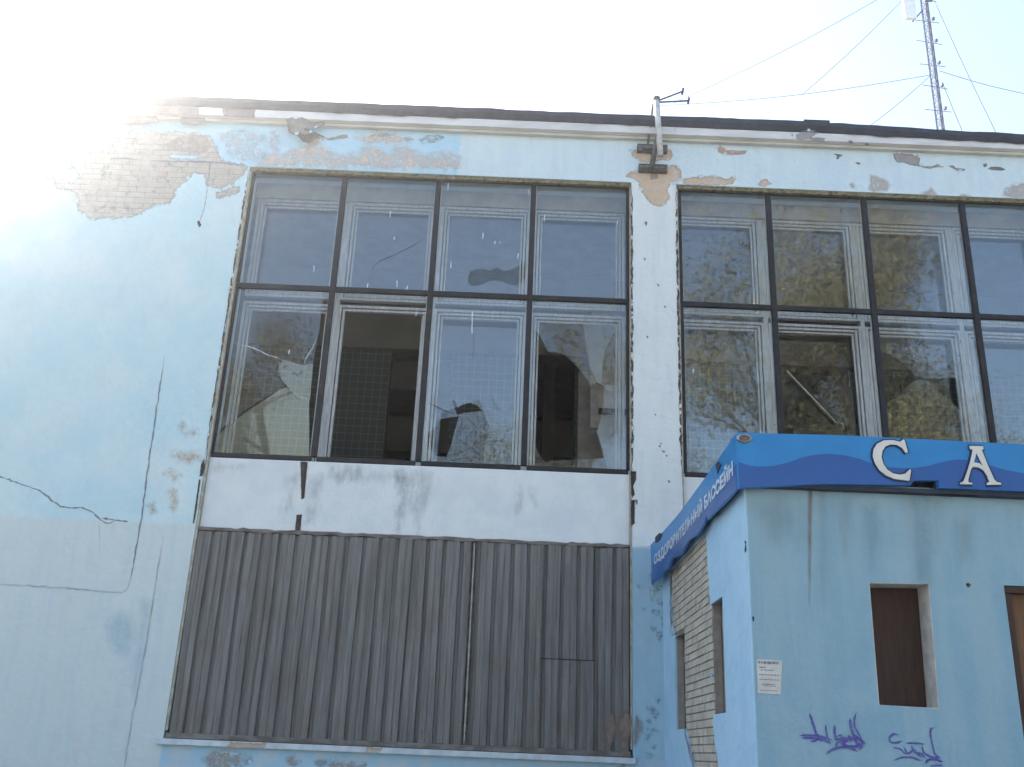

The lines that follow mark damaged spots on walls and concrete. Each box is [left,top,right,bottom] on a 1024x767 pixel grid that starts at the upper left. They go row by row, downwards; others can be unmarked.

peeling [39,115,459,523]
spalling [626,149,736,525]
peeling [716,145,747,156]
spalling [893,151,965,172]
crack [0,357,165,767]